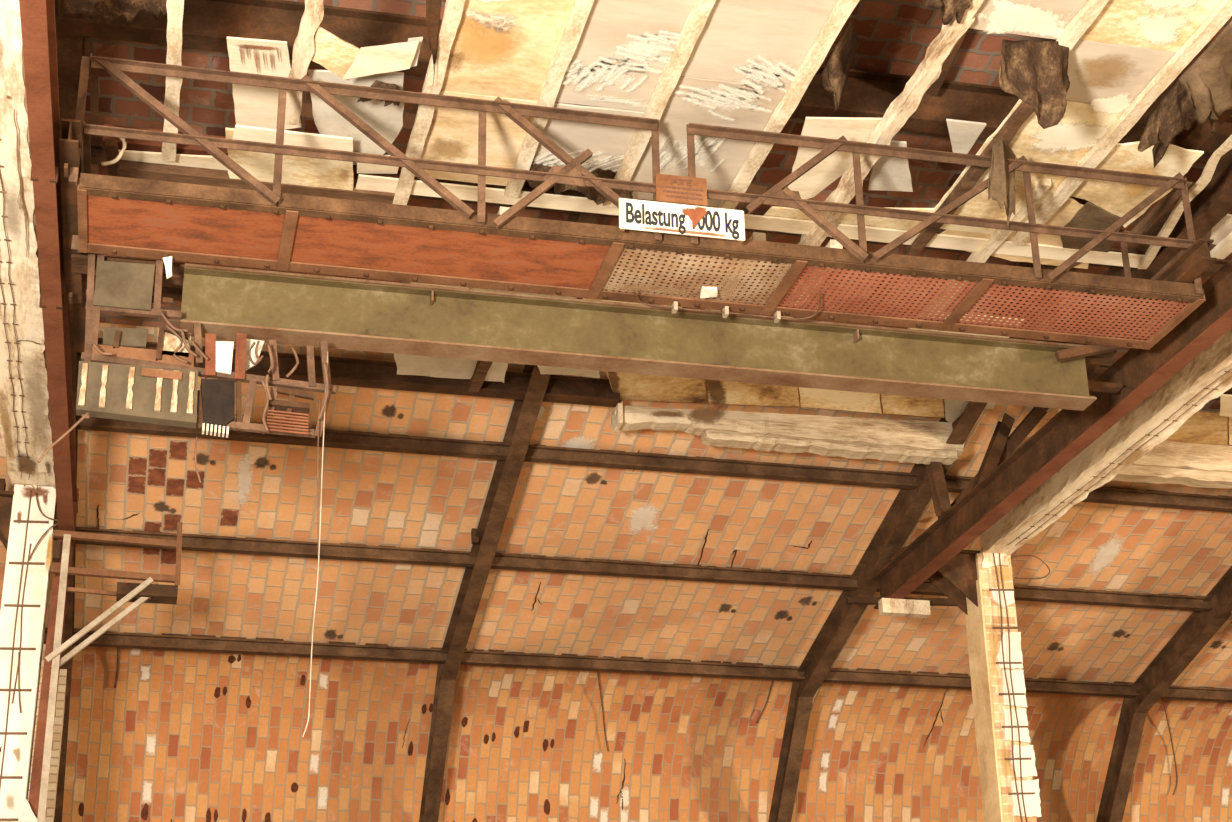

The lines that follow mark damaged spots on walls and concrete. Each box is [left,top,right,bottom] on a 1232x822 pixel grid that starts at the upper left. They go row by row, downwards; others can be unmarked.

leakage [447,21,511,68]
crack [698,529,737,567]
spalling [990,626,998,670]
crack [616,759,626,810]
flaking render [22,799,37,822]